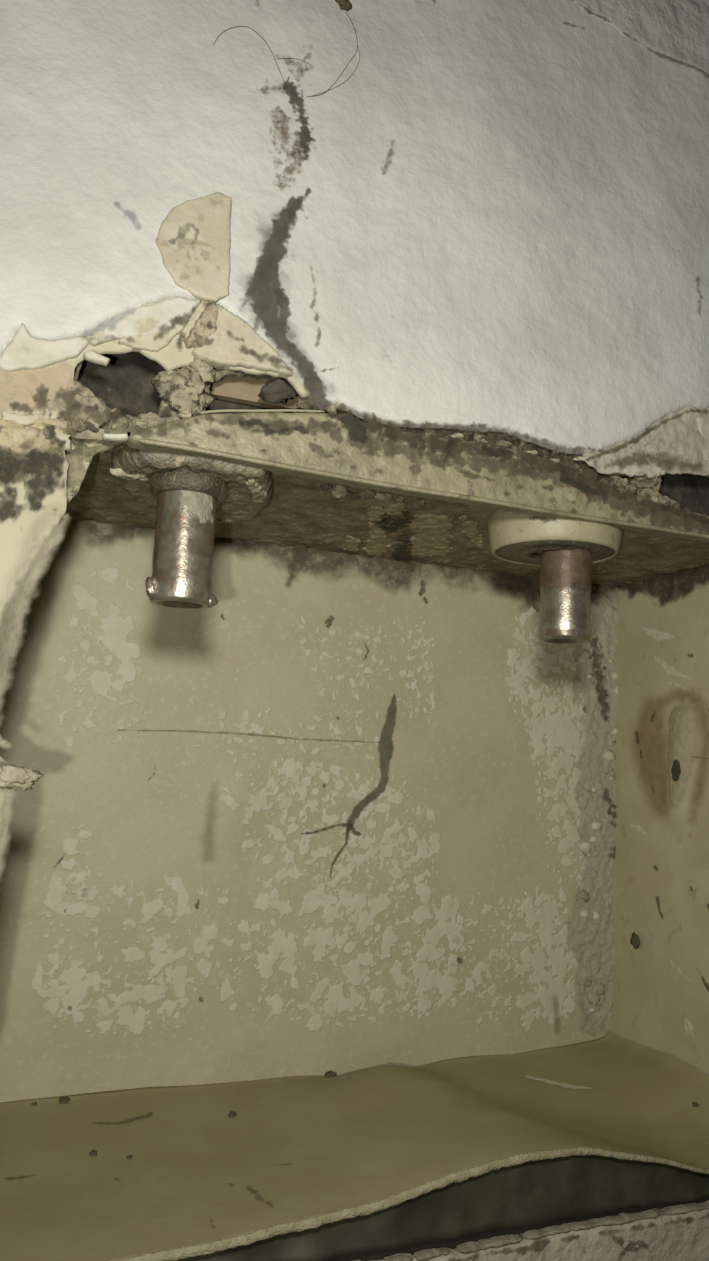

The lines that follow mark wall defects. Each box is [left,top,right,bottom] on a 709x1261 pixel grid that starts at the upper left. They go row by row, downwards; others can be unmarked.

water stain [0,423,66,520]
water stain [89,520,147,542]
water stain [109,468,148,481]
water stain [245,479,267,504]
peeling [0,192,709,705]
water stain [215,511,540,609]
corrosion [540,549,592,589]
peeling [51,562,144,750]
flaking render [0,788,13,872]
crack [118,695,396,876]
peeling [31,606,599,1037]
water stain [569,564,709,1034]